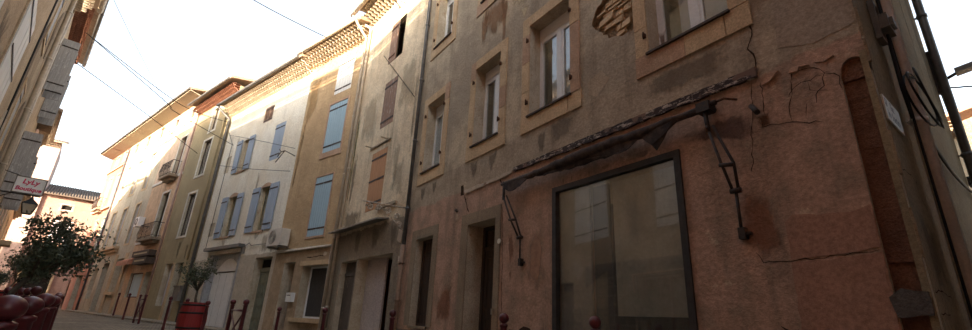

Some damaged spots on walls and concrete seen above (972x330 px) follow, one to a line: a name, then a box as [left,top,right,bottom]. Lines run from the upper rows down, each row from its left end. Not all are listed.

spalling [592,0,634,38]
crack [747,25,843,171]
peeling [791,57,935,330]
peeling [963,124,972,149]